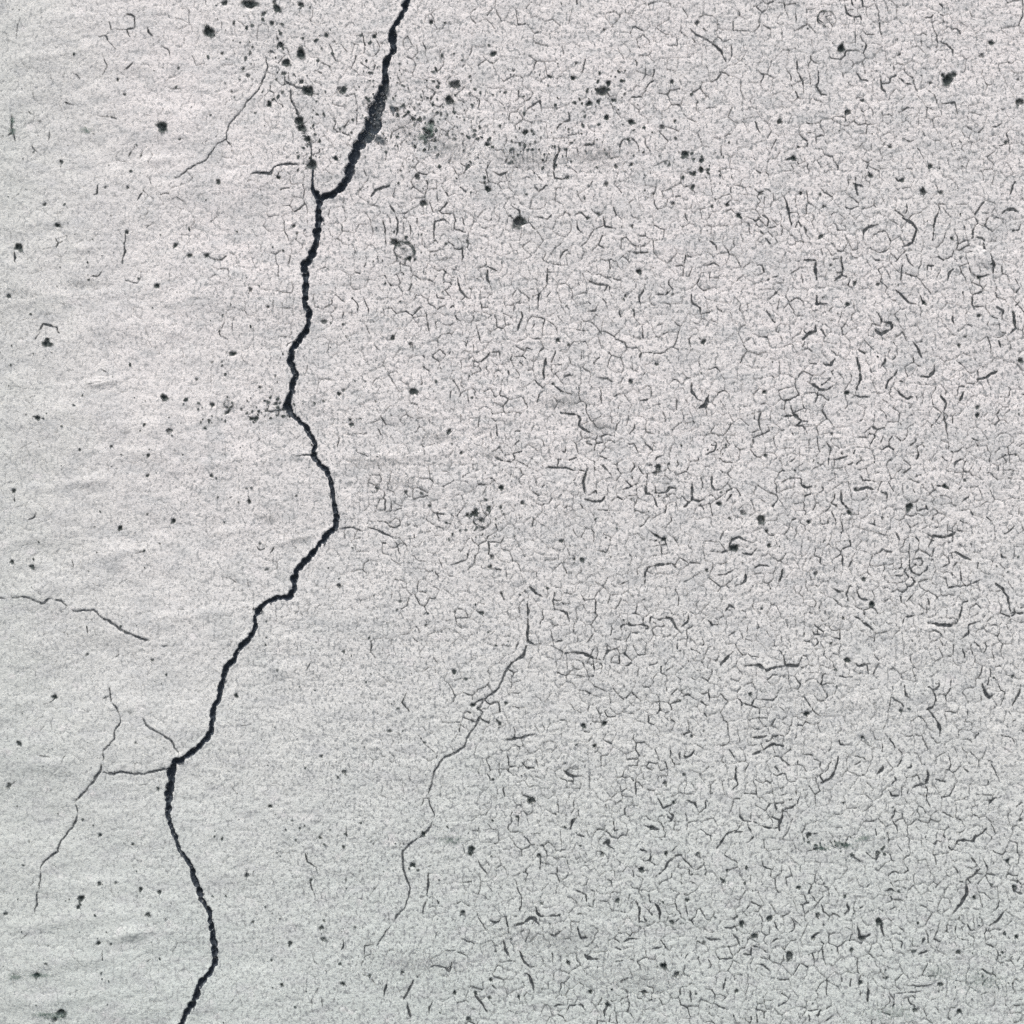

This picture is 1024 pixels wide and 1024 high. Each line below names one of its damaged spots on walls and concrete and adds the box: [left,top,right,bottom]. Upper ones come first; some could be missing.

crack [99,1,206,72]
crack [470,1,544,45]
crack [786,49,827,103]
crack [656,88,707,149]
crack [62,233,139,304]
crack [23,318,60,339]
crack [354,402,437,453]
crack [395,464,521,642]
crack [0,587,166,657]
crack [467,727,587,891]
crack [420,865,446,916]
crack [384,980,414,1017]